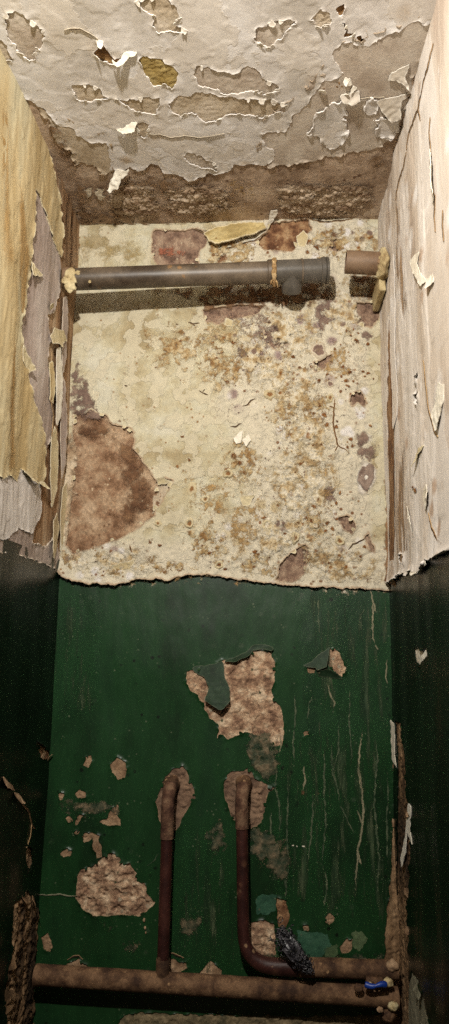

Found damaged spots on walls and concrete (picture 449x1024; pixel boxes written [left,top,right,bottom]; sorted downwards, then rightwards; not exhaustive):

peeling [0,11,45,64]
peeling [71,40,289,138]
flaking render [107,169,374,265]
water stain [331,216,379,251]
peeling [23,296,173,561]
water stain [70,363,150,523]
water stain [176,274,407,593]
efflorescence [62,547,153,586]
flaking render [186,650,284,746]
flaking render [66,804,155,916]
spalling [118,720,429,1024]
spalling [5,892,53,1024]